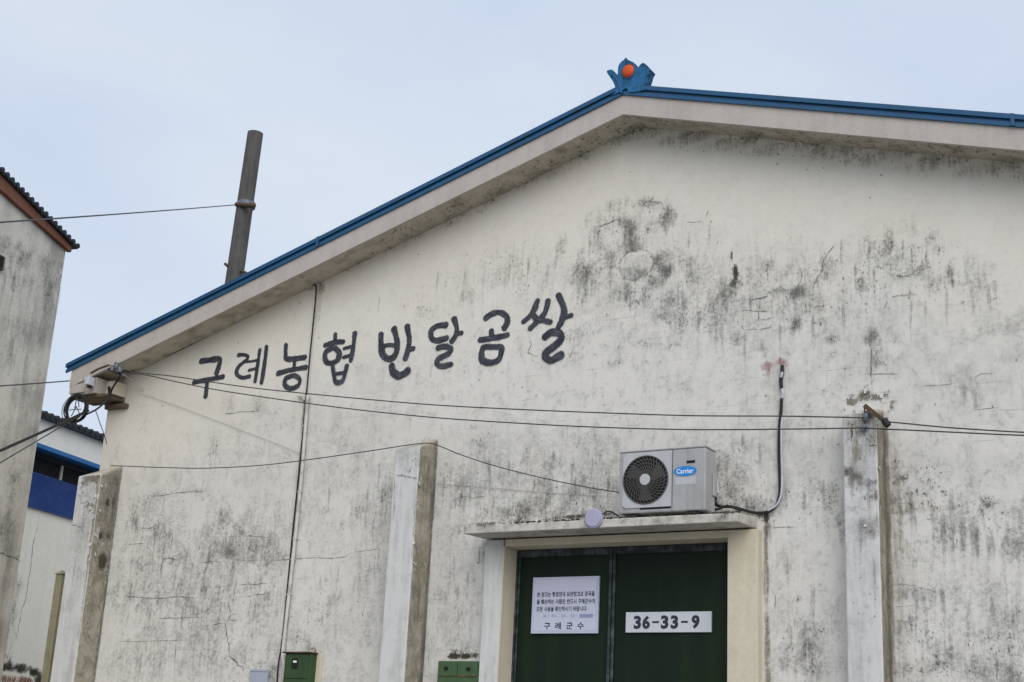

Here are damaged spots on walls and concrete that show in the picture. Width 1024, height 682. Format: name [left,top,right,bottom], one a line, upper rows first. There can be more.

leakage [523,116,1015,185]
leakage [601,217,649,253]
leakage [572,262,592,287]
leakage [625,252,824,329]